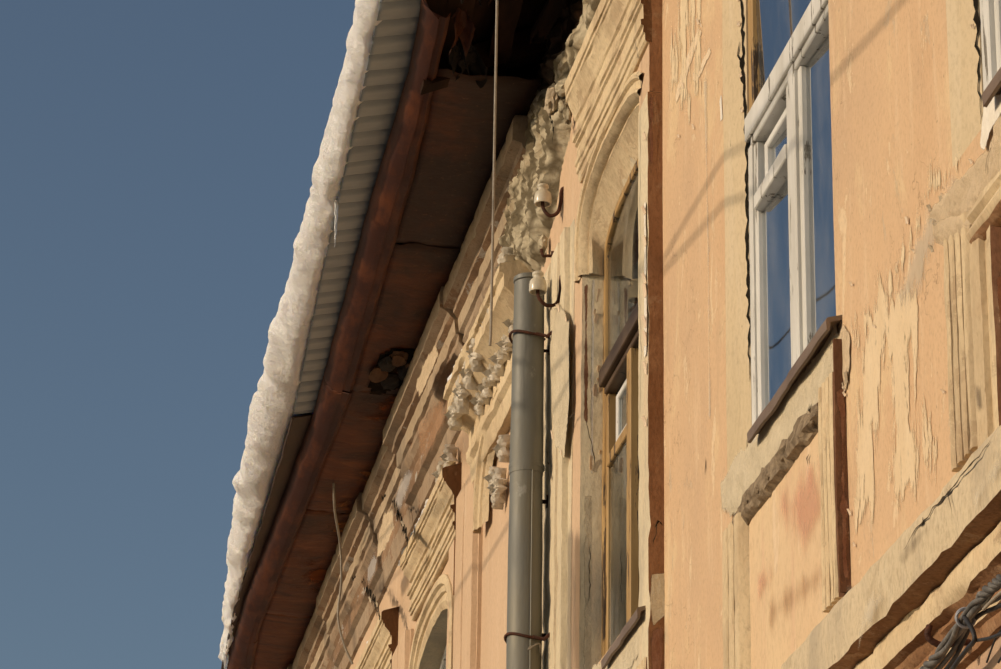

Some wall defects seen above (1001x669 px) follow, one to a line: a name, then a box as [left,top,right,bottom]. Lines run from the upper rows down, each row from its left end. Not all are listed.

flaking render [498,0,601,272]
peeling [670,0,711,129]
crack [736,0,751,380]
crack [971,0,992,174]
peeling [721,211,937,547]
crack [905,441,990,548]